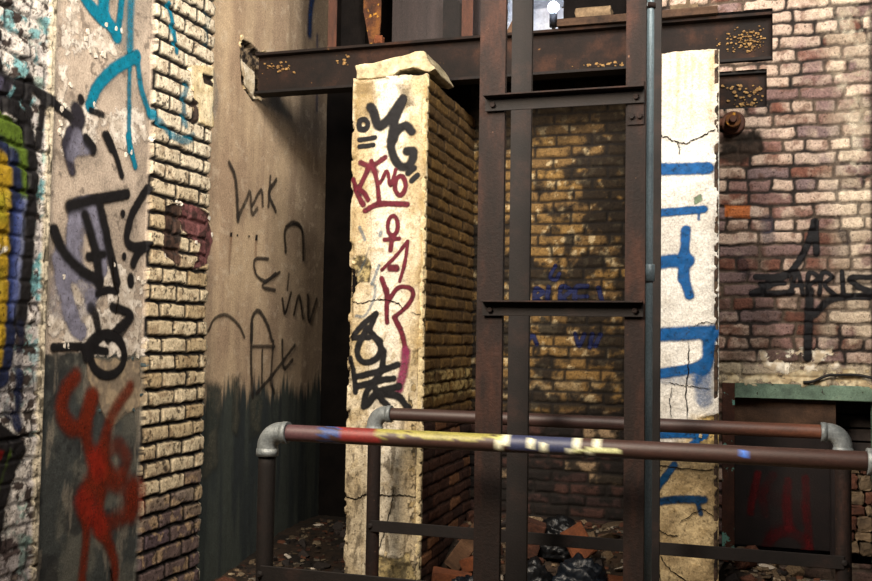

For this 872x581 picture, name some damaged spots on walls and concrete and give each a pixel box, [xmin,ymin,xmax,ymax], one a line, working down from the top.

crack [662,129,715,154]
leakage [203,384,221,477]
crack [660,509,714,537]